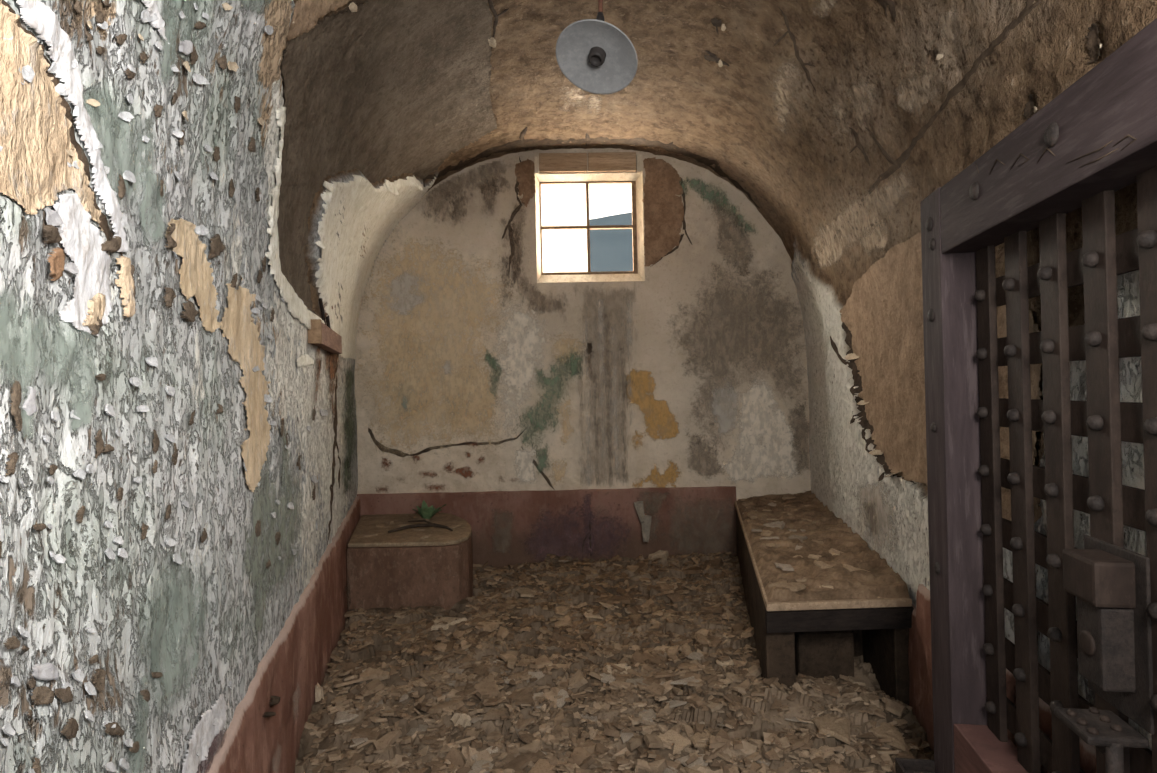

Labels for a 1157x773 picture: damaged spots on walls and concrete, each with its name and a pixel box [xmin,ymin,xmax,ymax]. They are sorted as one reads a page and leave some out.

peeling [73,0,210,84]
flaking render [0,0,136,336]
flaking render [163,0,497,500]
flaking render [642,157,685,266]
crack [816,0,1041,259]
peeling [0,452,25,487]
peeling [10,380,37,432]
peeling [73,404,122,479]
crack [368,428,555,490]
damp [516,445,567,482]
damp [626,202,809,511]
crack [830,314,917,484]